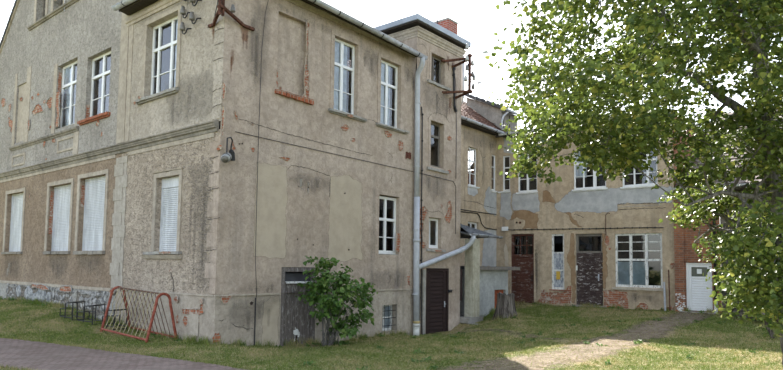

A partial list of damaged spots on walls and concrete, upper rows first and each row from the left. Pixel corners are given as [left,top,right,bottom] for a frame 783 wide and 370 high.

spalling [1,72,62,133]
spalling [420,206,442,252]
peeling [511,210,539,229]
spalling [537,212,581,305]
spalling [602,233,648,309]
spalling [6,283,115,316]
spalling [173,296,205,327]